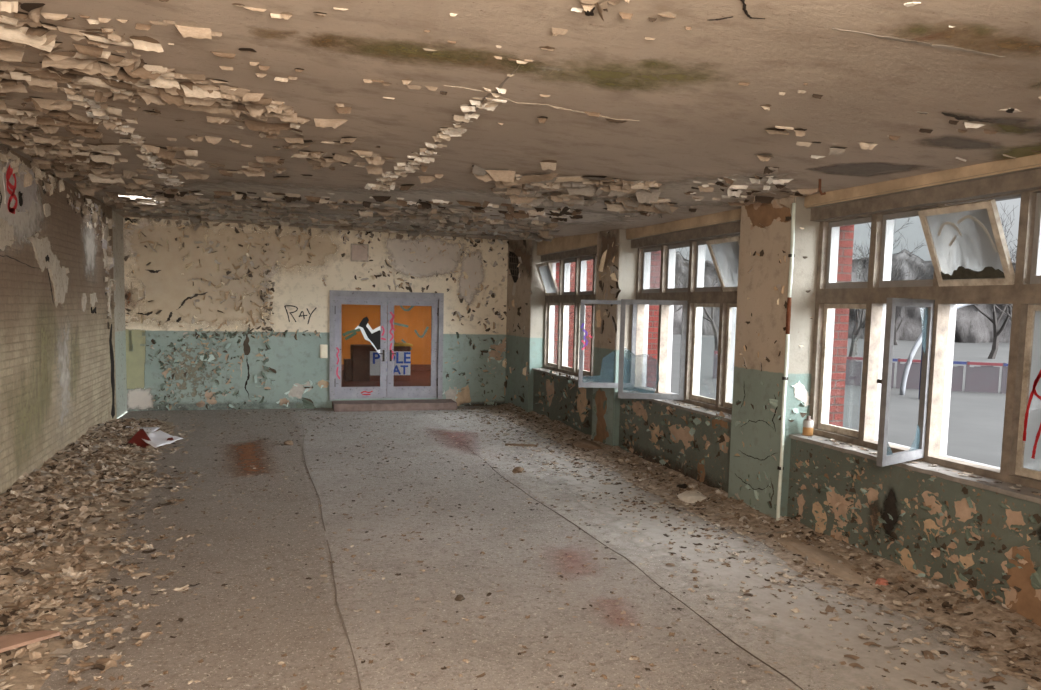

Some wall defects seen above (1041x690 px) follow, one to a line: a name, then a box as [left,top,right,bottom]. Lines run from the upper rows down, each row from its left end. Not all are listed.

flaking render [0,0,818,483]
peeling [764,126,877,159]